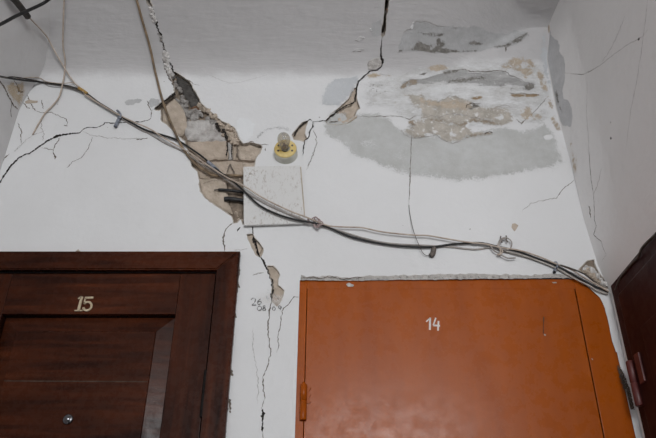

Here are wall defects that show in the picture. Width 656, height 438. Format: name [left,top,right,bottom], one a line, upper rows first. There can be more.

flaking render [397,20,528,54]
crack [0,0,196,183]
flaking render [326,88,360,125]
crack [303,0,420,166]
flaking render [401,69,535,144]
flaking render [548,25,573,127]
flaking render [154,71,263,225]
crack [222,224,254,250]
flaking render [247,233,264,258]
flaking render [267,265,285,306]
crack [252,256,295,432]